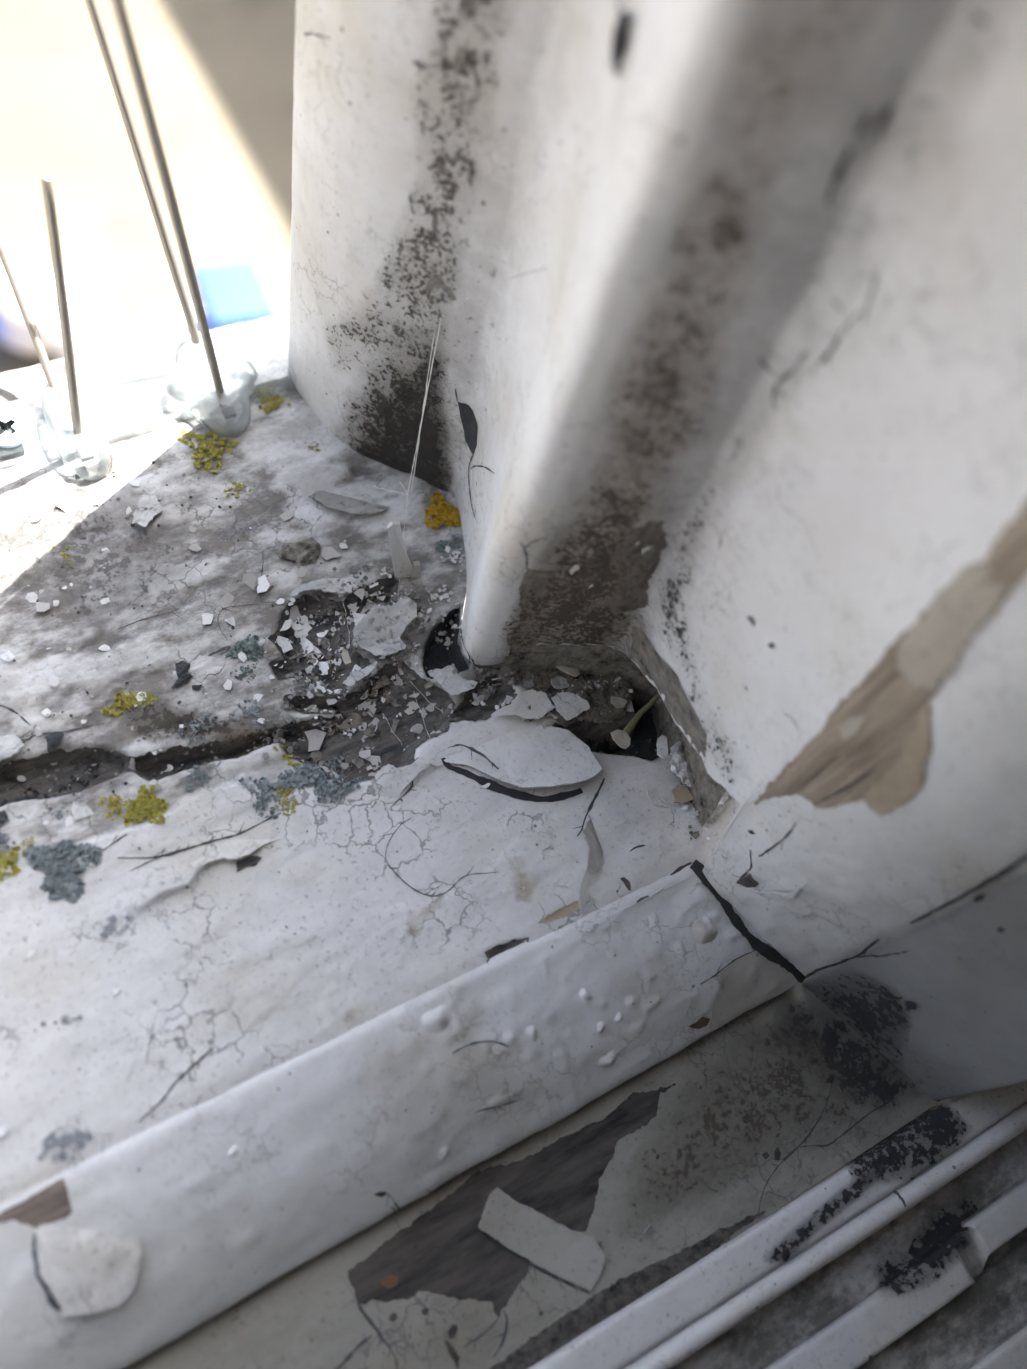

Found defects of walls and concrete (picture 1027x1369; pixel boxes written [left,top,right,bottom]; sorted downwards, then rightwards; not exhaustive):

leakage [326,0,519,491]
leakage [503,174,757,658]
peeling [341,596,418,687]
peeling [366,664,603,798]
crack [102,833,215,859]
crack [380,757,605,897]
crack [637,823,1027,983]
crack [138,1048,213,1123]
leakage [818,974,917,1062]
peeling [35,1224,142,1317]
peeling [348,1083,676,1322]
leakage [770,1105,966,1262]